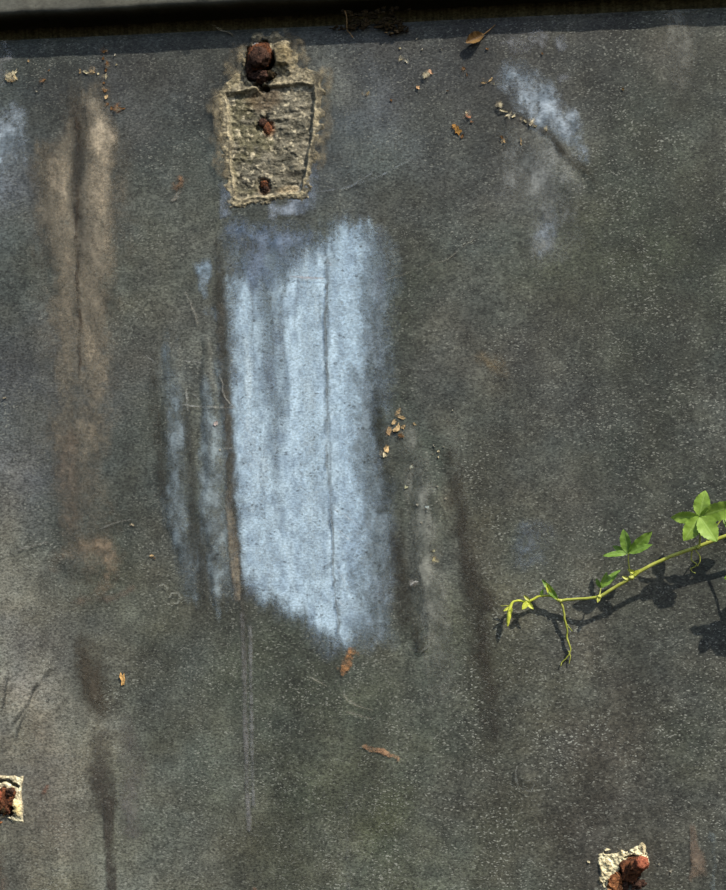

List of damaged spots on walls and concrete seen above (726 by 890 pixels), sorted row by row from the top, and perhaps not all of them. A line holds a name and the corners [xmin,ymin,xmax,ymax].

damp [0,111,22,164]
corrosion [245,61,277,85]
spalling [212,31,326,209]
damp [33,83,117,396]
crack [322,284,330,469]
damp [151,224,449,763]
crack [331,516,340,632]
damp [90,732,136,890]